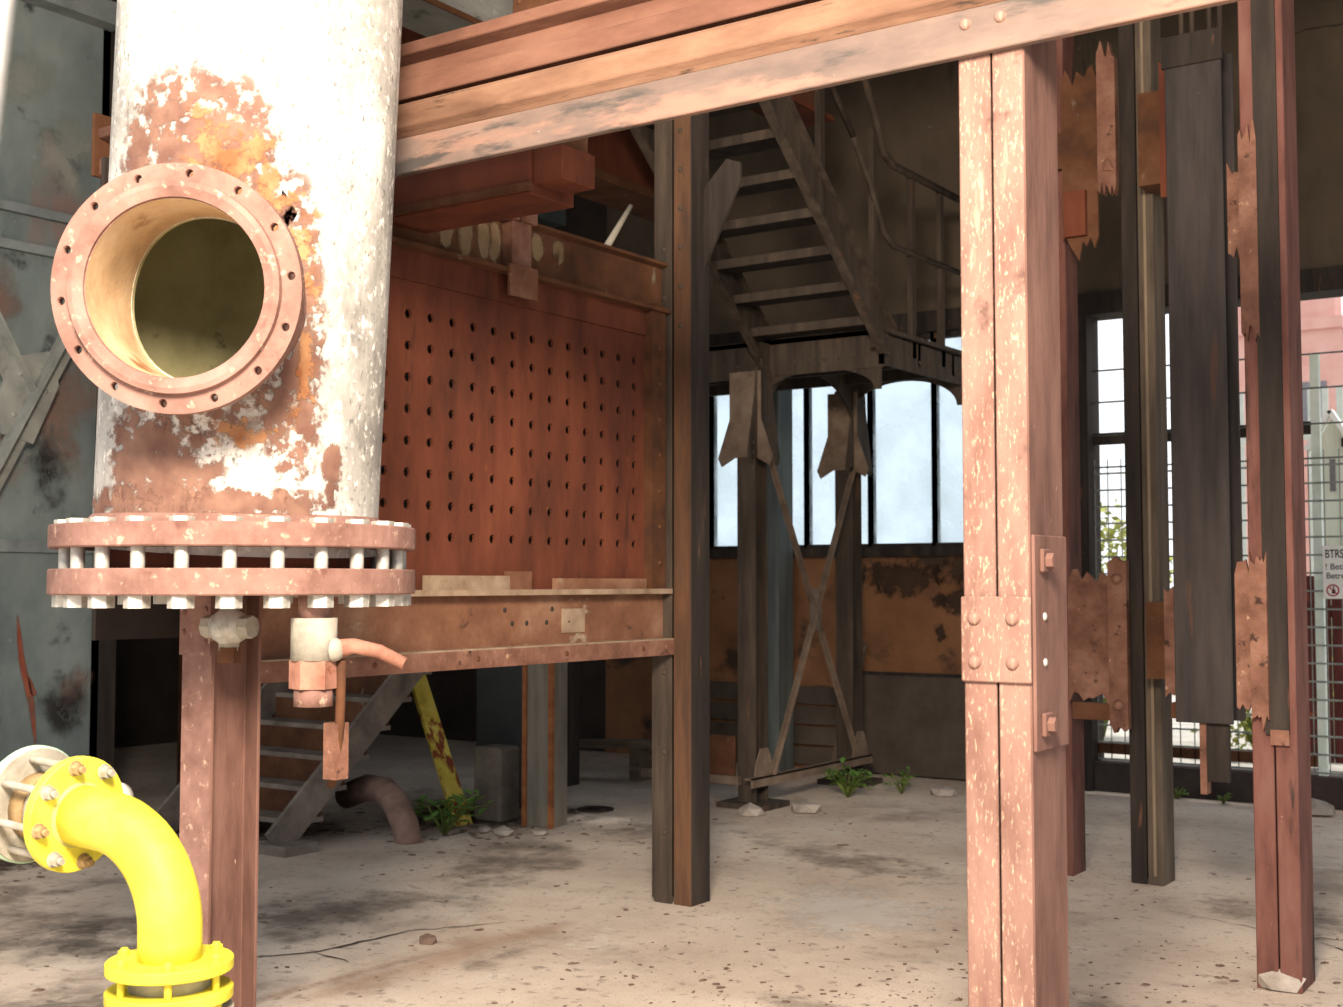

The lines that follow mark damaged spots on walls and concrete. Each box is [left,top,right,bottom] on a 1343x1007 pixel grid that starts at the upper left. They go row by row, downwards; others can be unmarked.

rust [92,68,342,516]